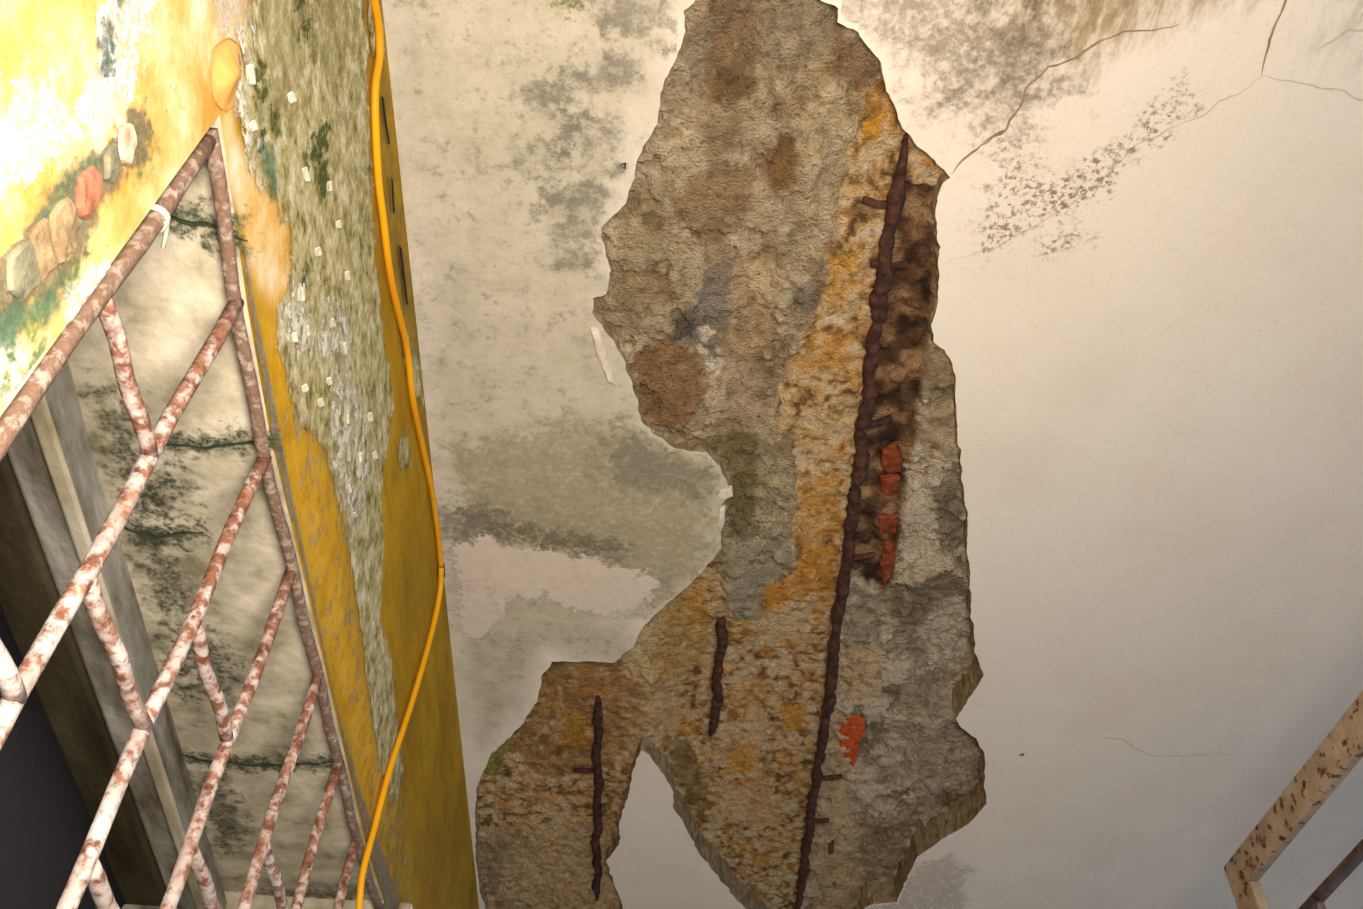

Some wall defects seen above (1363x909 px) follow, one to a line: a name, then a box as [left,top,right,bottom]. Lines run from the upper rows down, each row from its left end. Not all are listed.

mould [597,0,675,35]
water stain [1080,0,1134,43]
mould [522,51,639,161]
crack [947,0,1363,262]
mould [533,164,623,270]
mould [982,135,1135,254]
spalling [445,0,987,909]